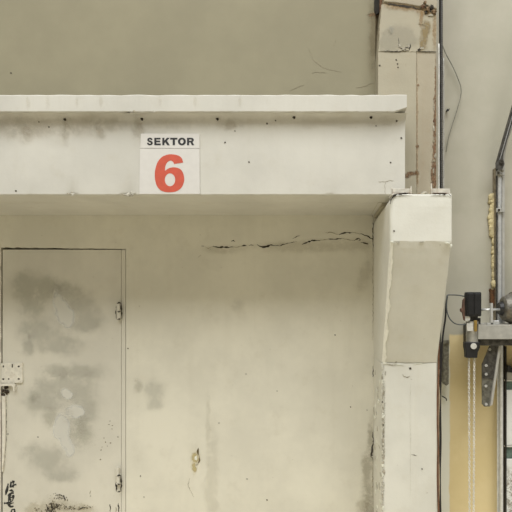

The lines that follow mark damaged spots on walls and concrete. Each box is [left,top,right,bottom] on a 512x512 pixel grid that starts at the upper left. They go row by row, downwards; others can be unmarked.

corrosion [420,22,430,47]
crack [206,215,374,250]
peeling [373,361,403,512]